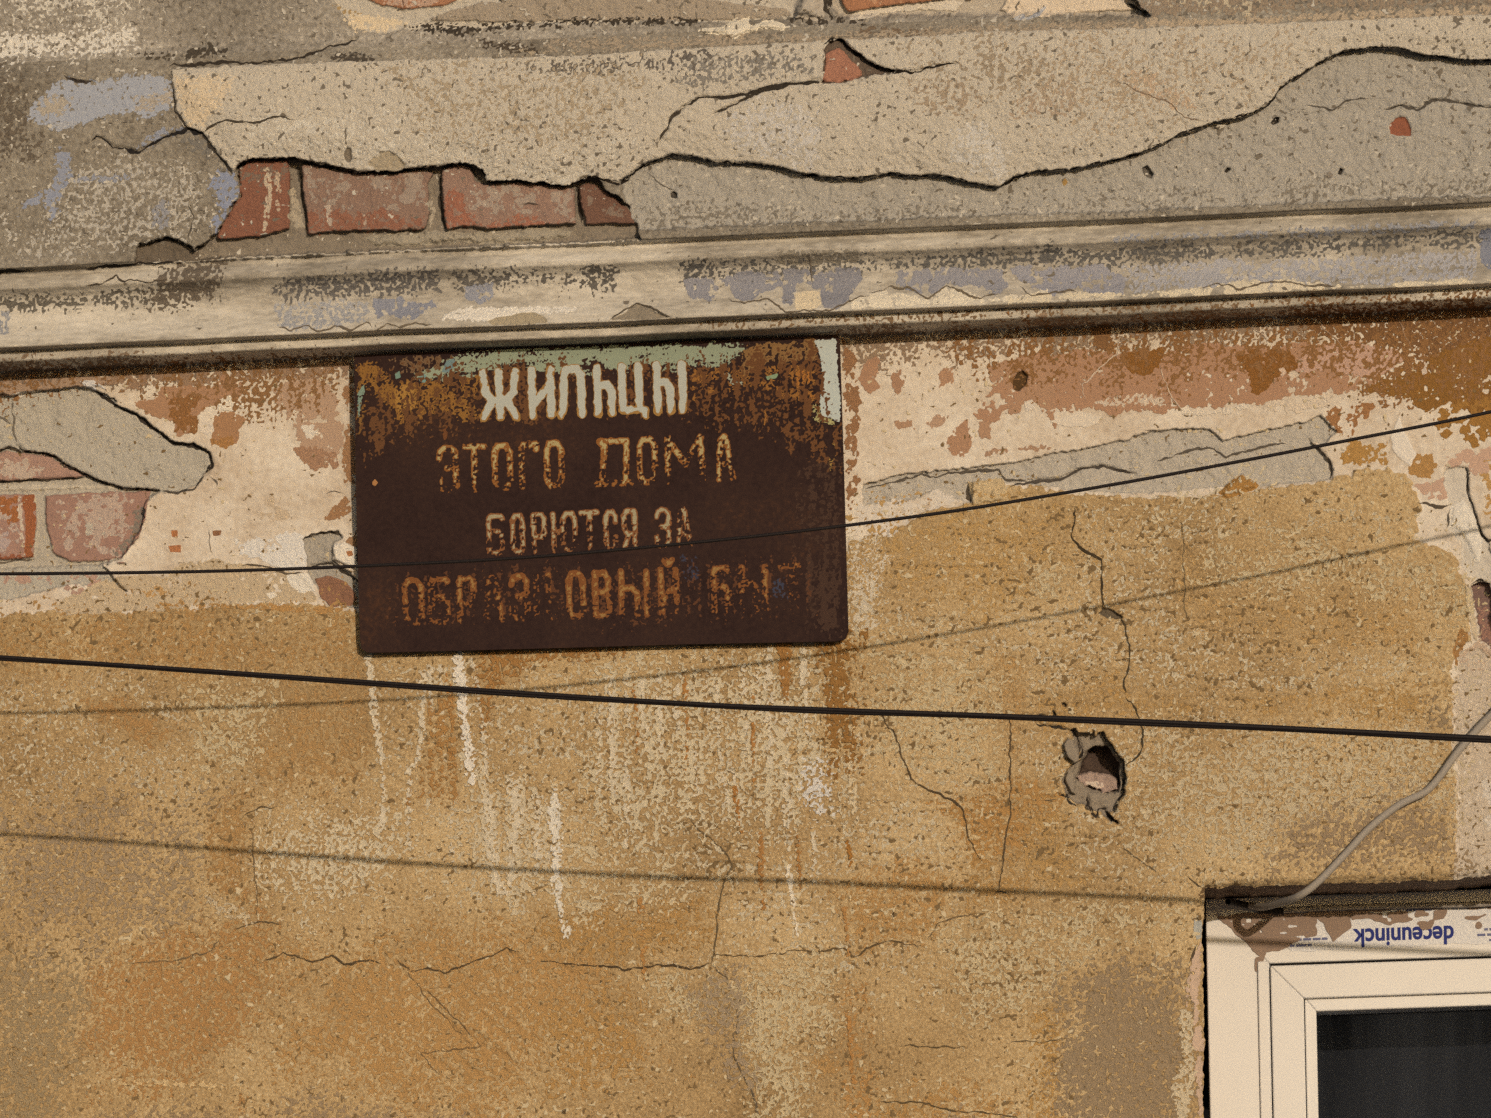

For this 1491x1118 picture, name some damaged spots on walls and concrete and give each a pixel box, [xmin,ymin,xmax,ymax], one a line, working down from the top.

crack [92,40,1491,231]
peeling [134,0,1491,263]
crack [823,0,956,74]
spalling [0,359,353,600]
spalling [267,531,359,608]
crack [1082,338,1120,397]
spalling [858,341,1427,505]
spalling [1414,446,1491,647]
crack [132,369,1332,1114]
damp [0,422,1491,1118]
spalling [1062,728,1125,824]
crack [882,1101,1017,1118]